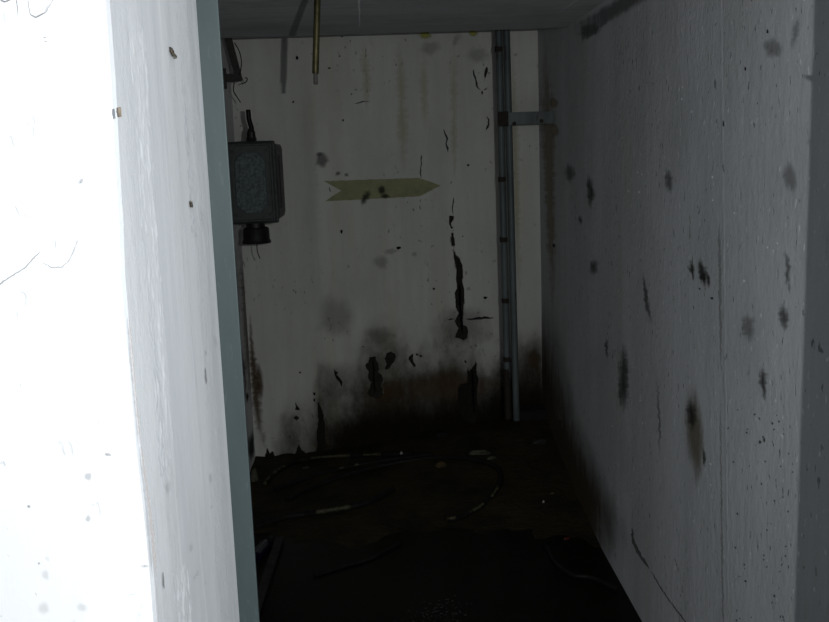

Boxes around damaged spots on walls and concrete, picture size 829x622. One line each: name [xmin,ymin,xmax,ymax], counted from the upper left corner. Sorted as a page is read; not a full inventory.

peeling [449,216,469,341]
rust [243,283,262,426]
peeling [365,352,396,398]
water stain [309,354,543,452]
water stain [619,359,627,399]